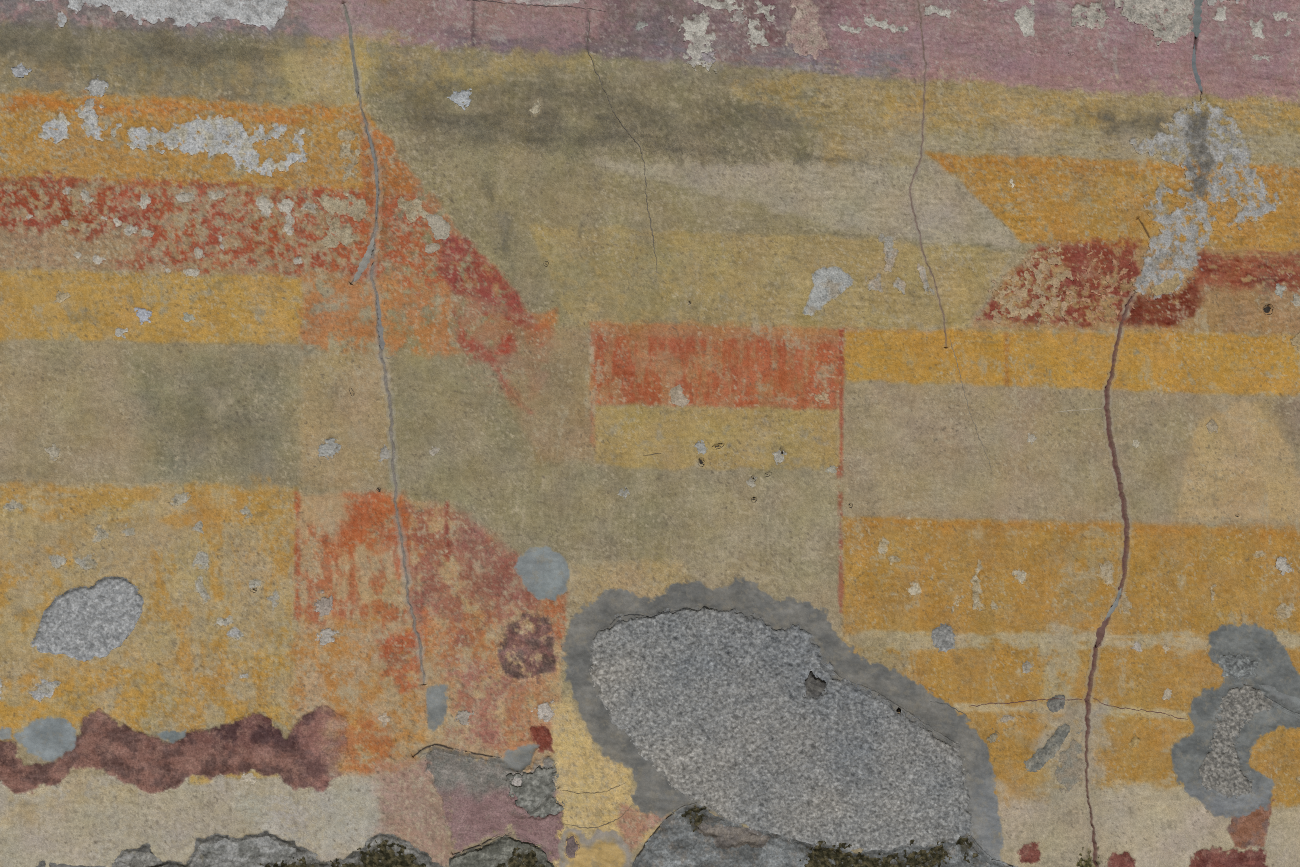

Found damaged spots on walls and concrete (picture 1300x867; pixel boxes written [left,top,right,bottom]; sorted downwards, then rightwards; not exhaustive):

peeling [35,0,289,31]
peeling [668,0,909,73]
peeling [1071,0,1255,45]
crack [1189,0,1206,102]
peeling [37,75,369,249]
crack [906,0,993,472]
spalling [986,94,1283,327]
crack [1136,217,1154,243]
crack [339,3,429,685]
spalling [30,523,144,662]
spalling [36,745,567,867]
flaking render [632,804,1015,867]